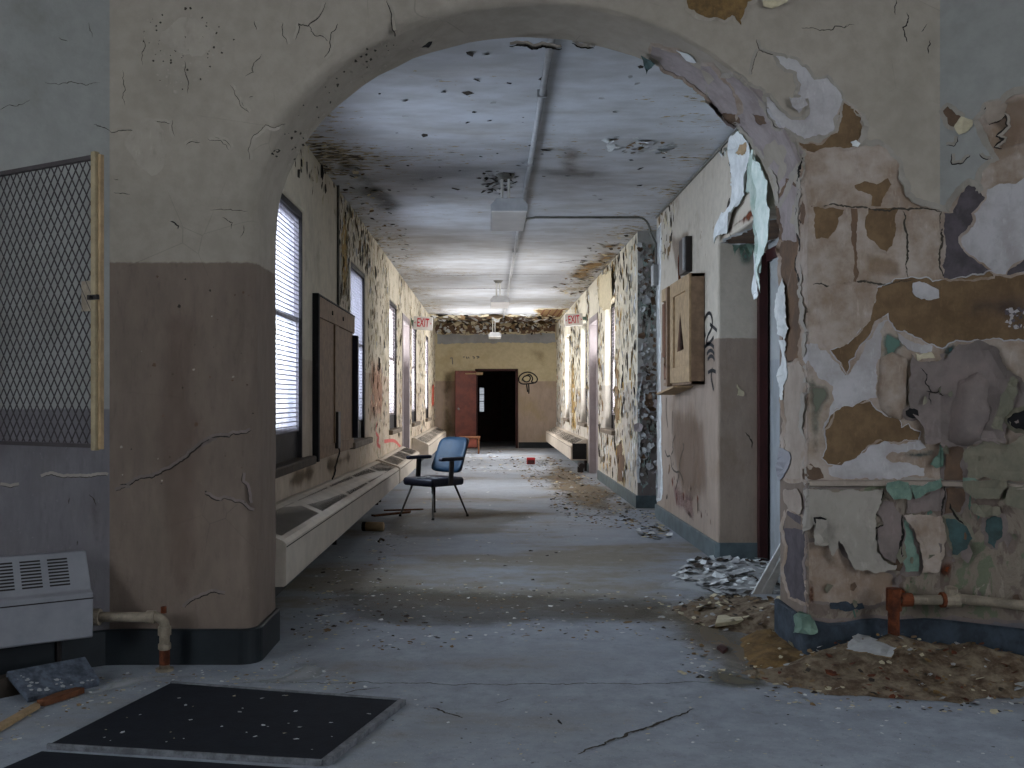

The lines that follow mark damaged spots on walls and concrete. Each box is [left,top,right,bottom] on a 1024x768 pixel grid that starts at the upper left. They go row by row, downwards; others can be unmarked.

crack [45,2,341,160]
spalling [684,0,788,27]
peeling [295,136,711,525]
spalling [628,42,1024,635]
crack [0,427,251,504]
crack [578,709,692,754]